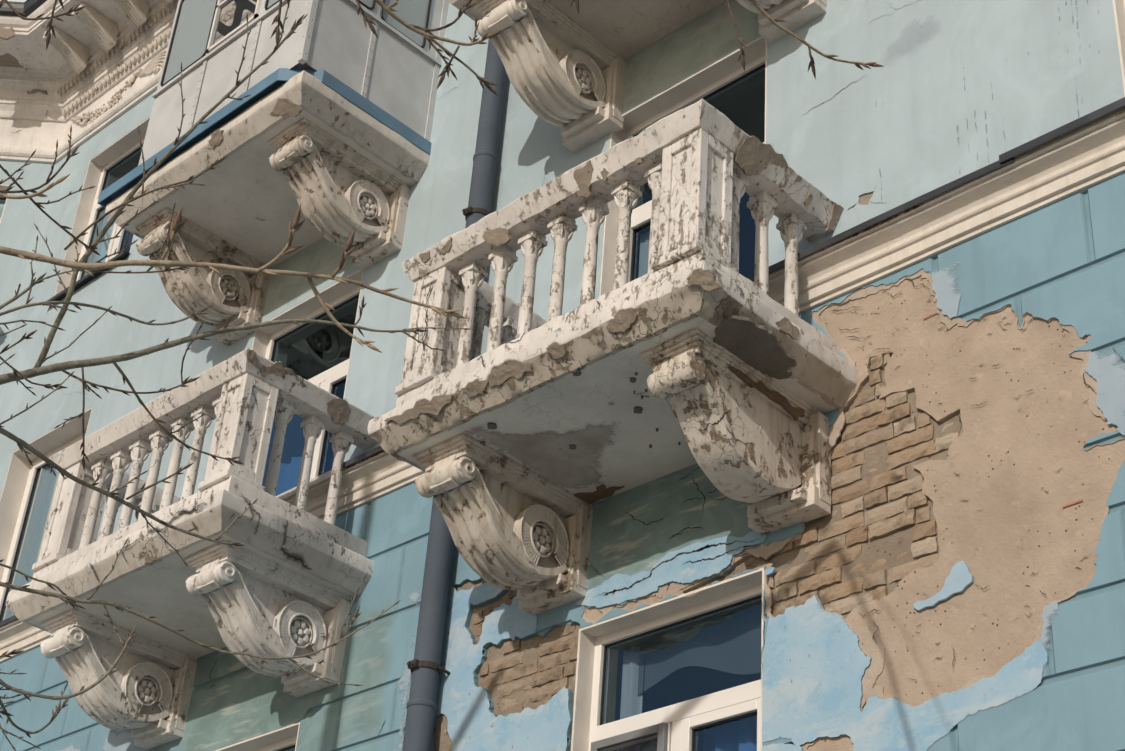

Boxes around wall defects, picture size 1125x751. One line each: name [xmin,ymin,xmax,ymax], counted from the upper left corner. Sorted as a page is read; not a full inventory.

spalling [733,136,788,176]
spalling [573,160,609,197]
spalling [419,238,452,262]
spalling [482,228,512,246]
spalling [327,398,351,424]
spalling [384,359,534,425]
flaking render [434,268,1125,751]
crack [593,467,757,598]